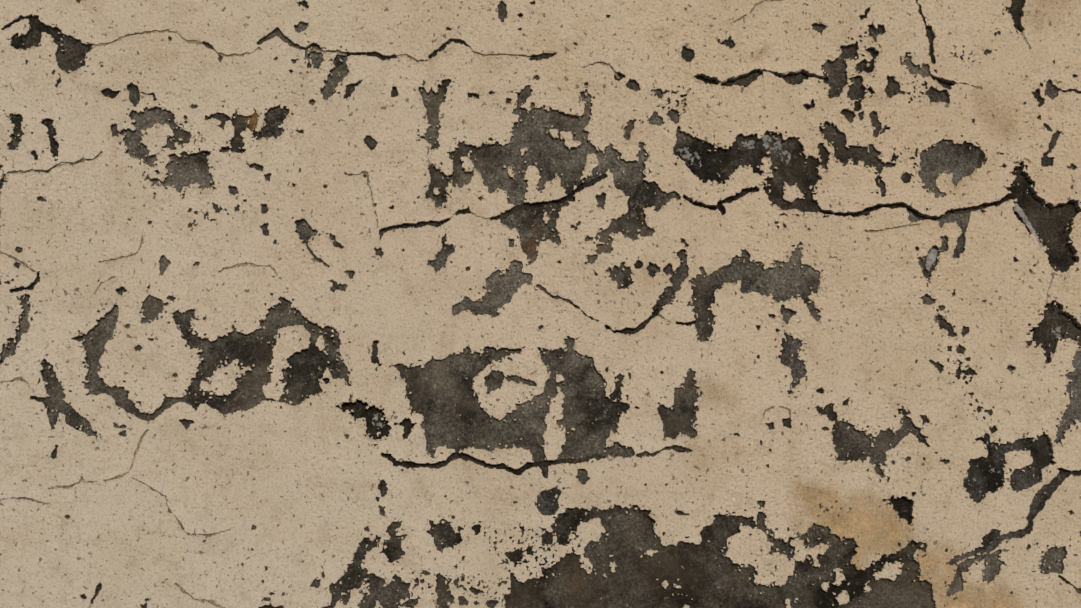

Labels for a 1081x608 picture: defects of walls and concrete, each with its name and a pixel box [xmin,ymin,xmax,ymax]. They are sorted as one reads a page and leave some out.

peeling [1,8,94,86]
peeling [294,0,363,106]
crack [694,68,829,87]
crack [915,0,983,90]
peeling [0,106,64,189]
peeling [100,82,296,226]
crack [344,170,608,240]
crack [683,187,760,215]
crack [820,193,1018,234]
peeling [391,7,1081,526]
crack [380,451,606,476]
peeling [0,286,1014,608]